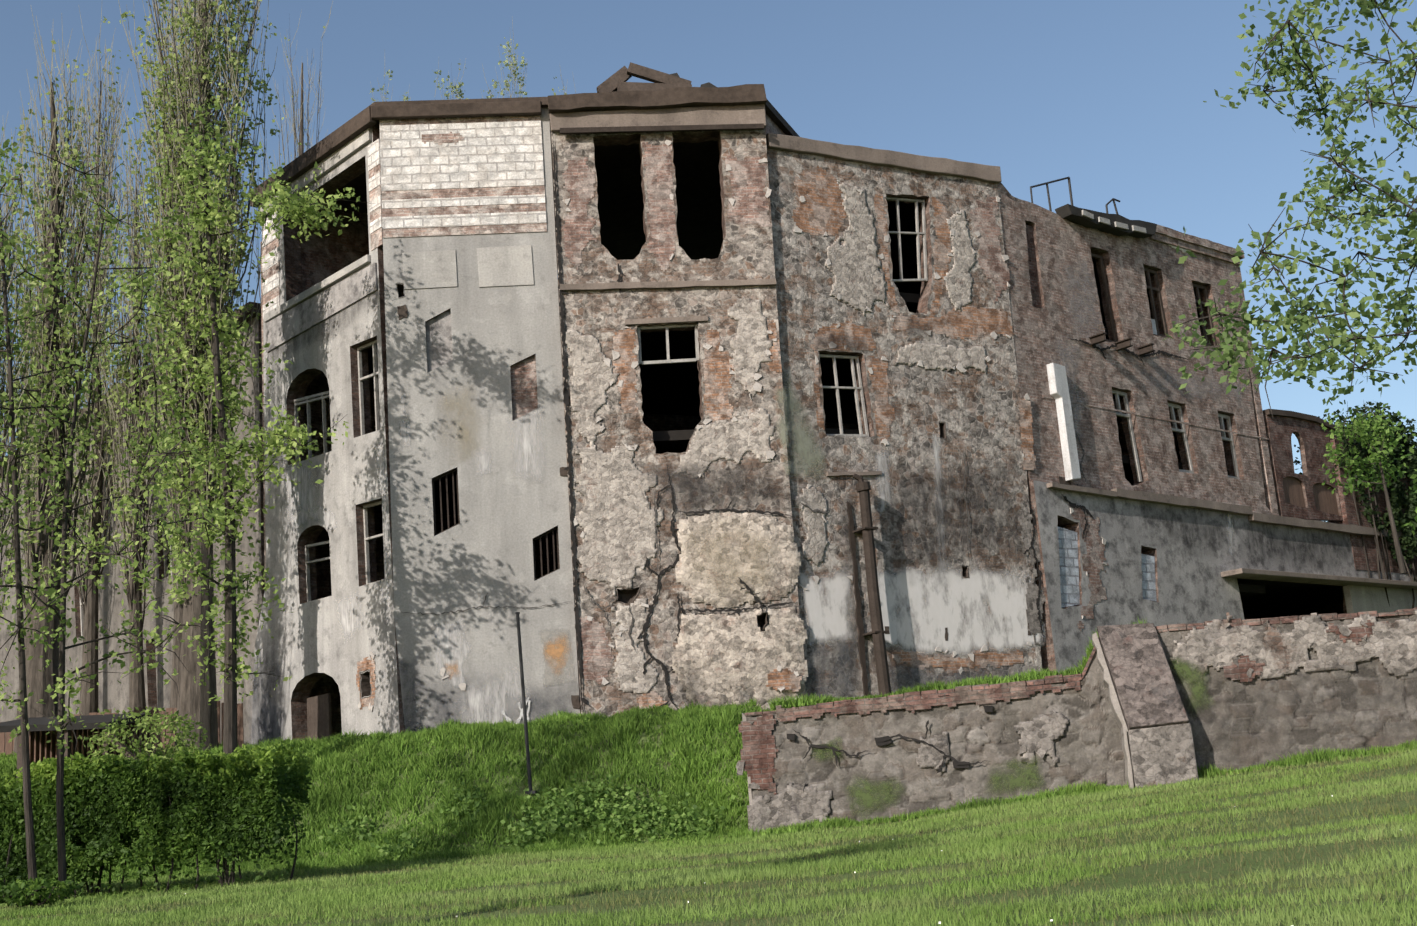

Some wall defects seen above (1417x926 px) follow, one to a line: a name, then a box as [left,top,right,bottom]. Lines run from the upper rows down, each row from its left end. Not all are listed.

peeling [792,165,1015,446]
crack [404,133,828,713]
peeling [877,509,1046,675]
spalling [356,651,376,712]
peeling [431,623,469,691]
peeling [1170,609,1417,684]
crack [793,720,986,774]